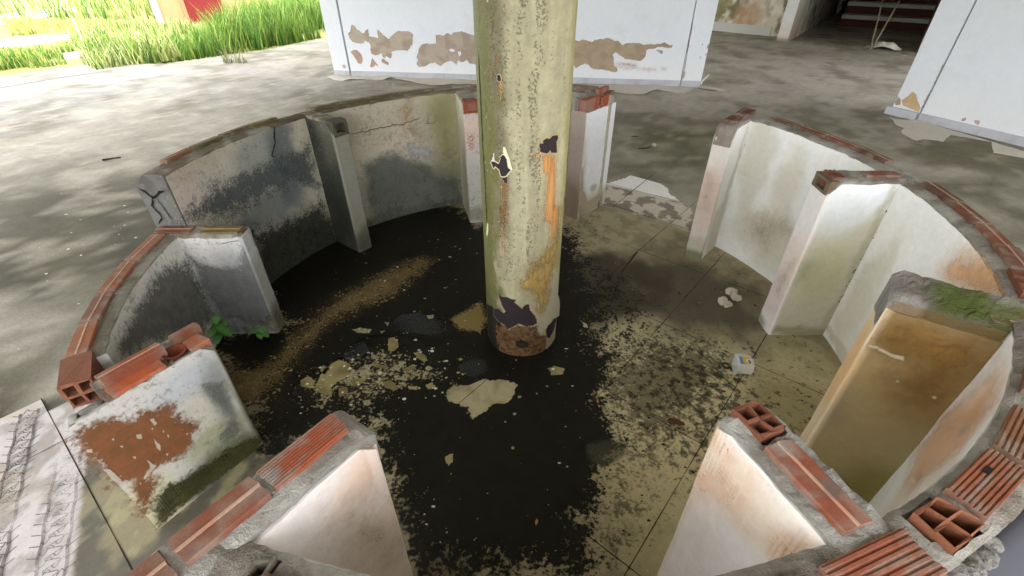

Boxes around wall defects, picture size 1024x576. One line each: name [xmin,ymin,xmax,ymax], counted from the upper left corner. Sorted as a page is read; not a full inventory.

peeling [342,24,476,70]
peeling [574,33,674,73]
crack [351,115,437,134]
spalling [895,91,921,113]
peeling [490,147,512,183]
crack [140,189,173,223]
corrosion [452,153,561,356]
peeling [493,269,560,338]
water stain [118,144,667,576]
water stain [879,321,985,404]
water stain [911,381,991,479]